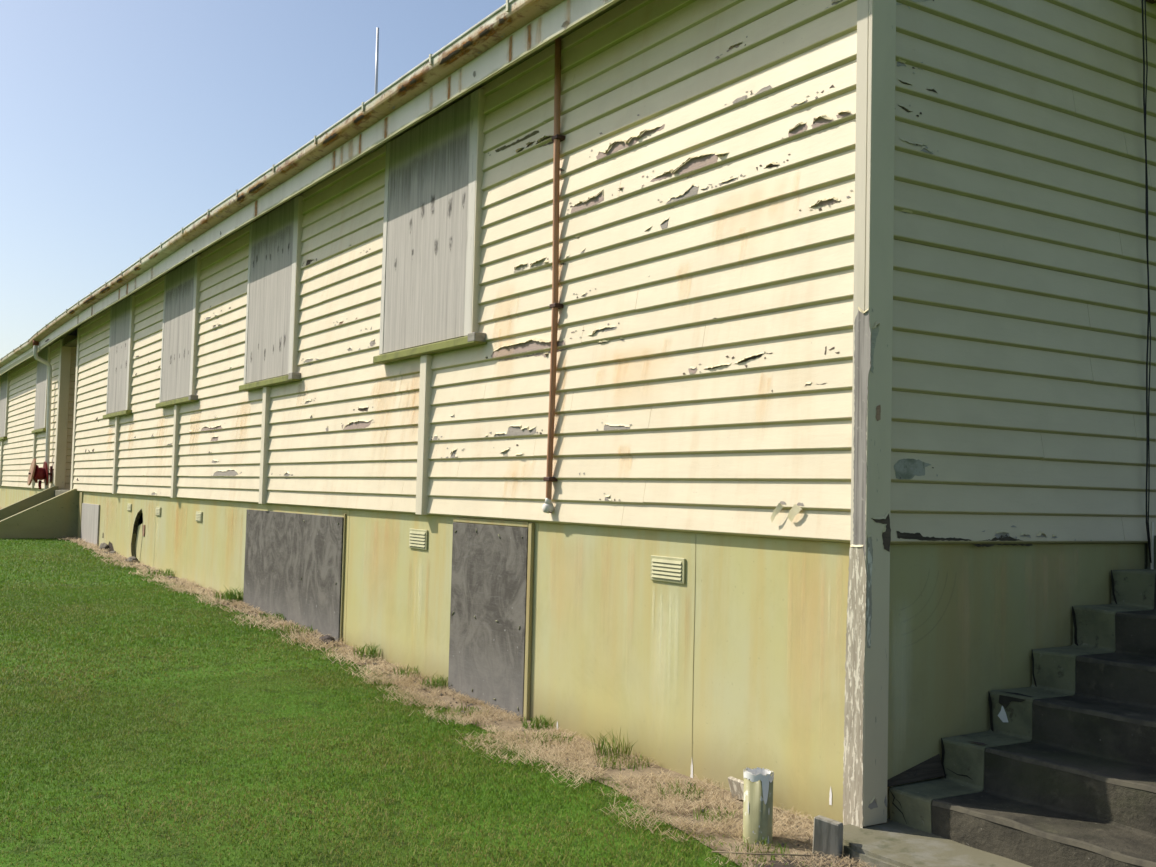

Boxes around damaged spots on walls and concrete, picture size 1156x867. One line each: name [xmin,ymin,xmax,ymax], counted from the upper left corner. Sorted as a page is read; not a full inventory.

rust [442,16,513,99]
rust [398,72,425,96]
rust [325,113,370,169]
peeling [589,124,665,160]
peeling [566,186,624,215]
peeling [641,152,790,232]
peeling [484,323,624,361]
peeling [326,406,374,432]
peeling [189,415,242,476]
peeling [486,425,542,456]
peeling [850,306,881,648]